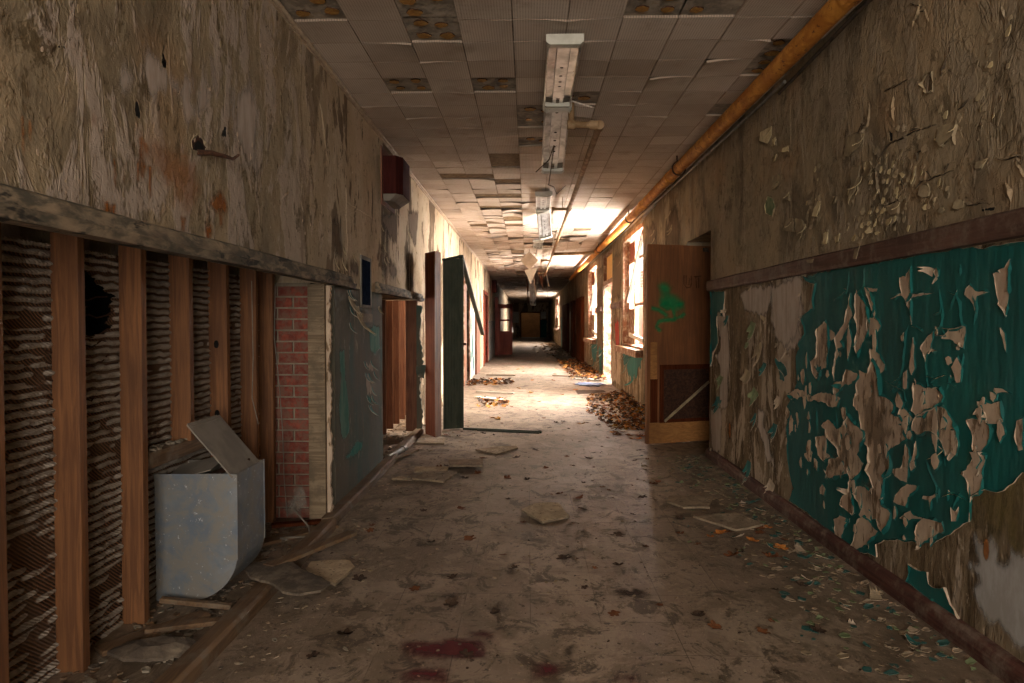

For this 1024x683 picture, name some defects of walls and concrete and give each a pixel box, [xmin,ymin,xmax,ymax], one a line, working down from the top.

peeling [742,39,792,74]
peeling [440,74,544,272]
flaking render [759,126,789,162]
flaking render [782,165,880,240]
flaking render [822,202,900,259]
flaking render [899,166,931,197]
peeling [741,259,1024,550]
peeling [640,309,985,683]